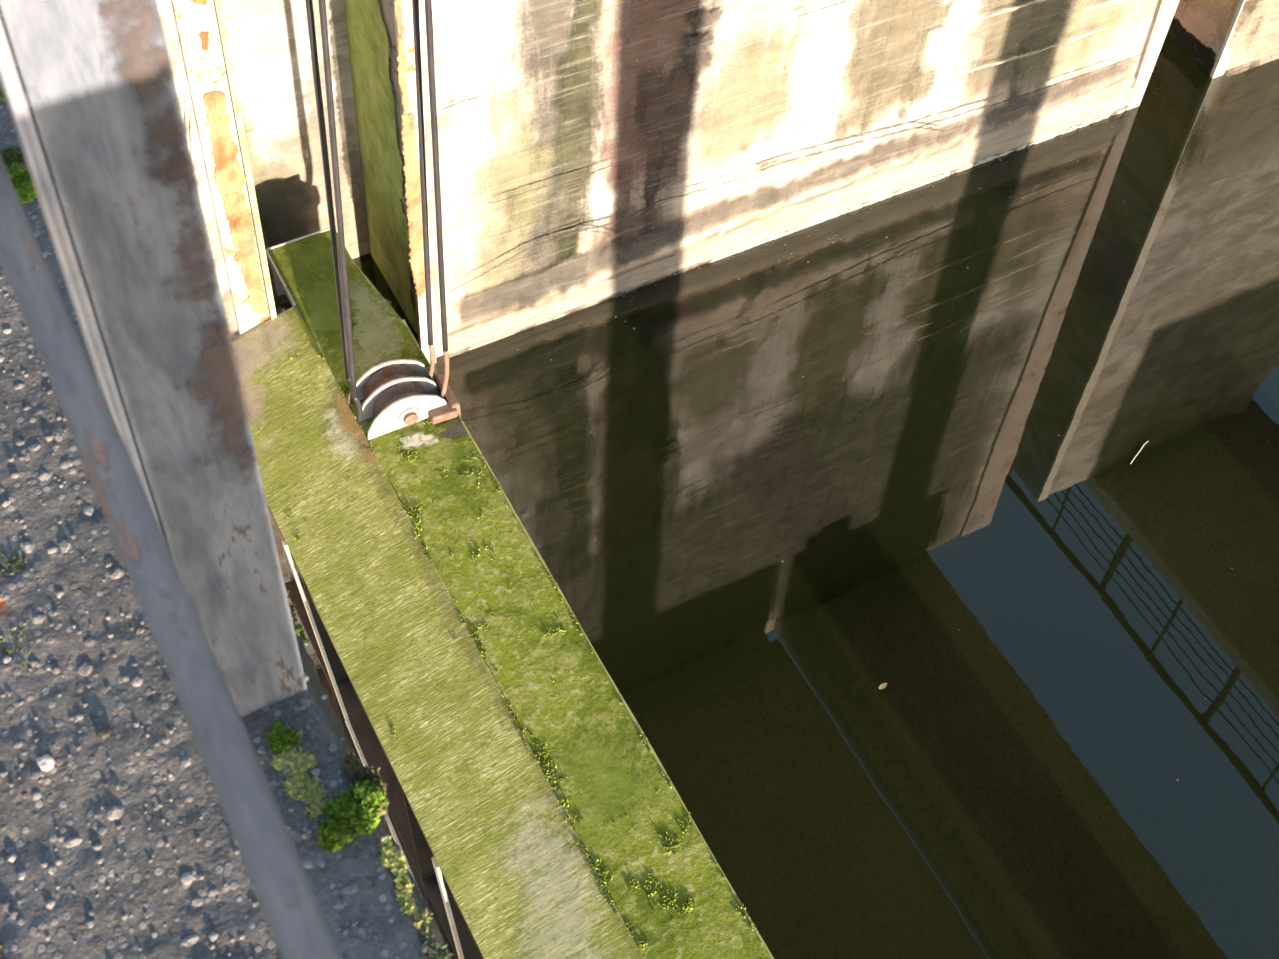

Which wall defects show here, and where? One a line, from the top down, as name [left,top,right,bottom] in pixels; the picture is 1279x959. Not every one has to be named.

rust [100,0,200,205]
rust [199,32,209,51]
rust [203,91,268,315]
damp [419,0,1138,356]
rust [176,221,264,468]